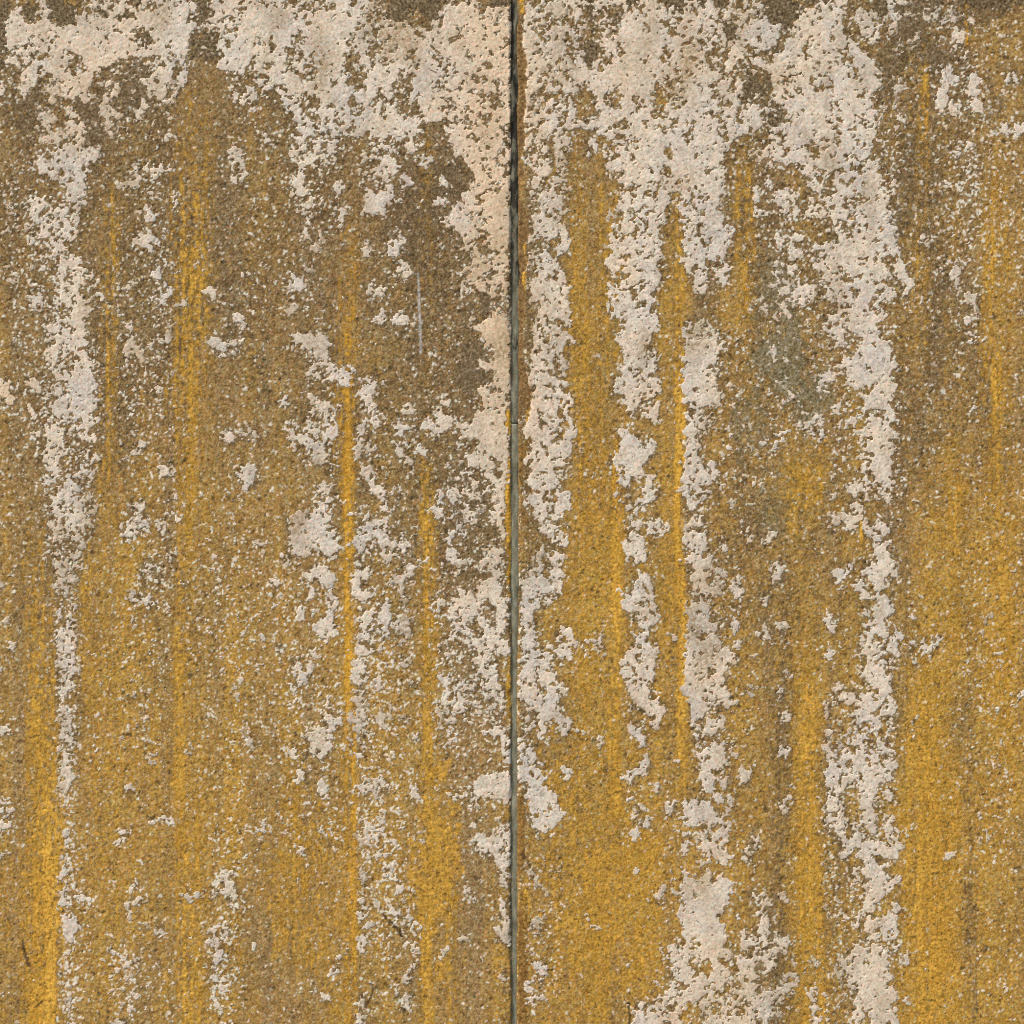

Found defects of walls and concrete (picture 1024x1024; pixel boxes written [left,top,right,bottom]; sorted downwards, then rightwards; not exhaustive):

water stain [0,0,10,68]
water stain [24,0,78,33]
water stain [95,2,130,19]
water stain [188,0,225,61]
water stain [382,0,441,38]
water stain [567,0,833,70]
water stain [862,0,1023,110]
water stain [74,32,185,157]
water stain [740,64,783,135]
water stain [380,136,476,277]
water stain [455,337,490,403]
water stain [448,466,487,529]